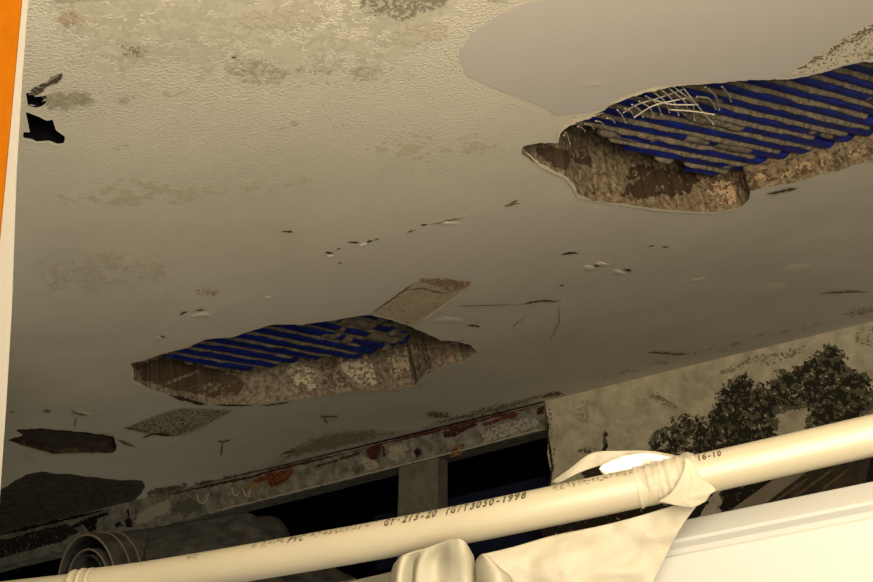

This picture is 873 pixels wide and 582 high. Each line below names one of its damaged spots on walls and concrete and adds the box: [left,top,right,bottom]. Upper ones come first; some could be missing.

water stain [44,0,473,97]
hole [23,93,66,145]
spalling [522,25,873,214]
spalling [8,428,118,456]
spalling [127,278,477,436]
corrosion [314,443,386,468]
corrosion [441,413,518,457]
water stain [648,343,873,455]